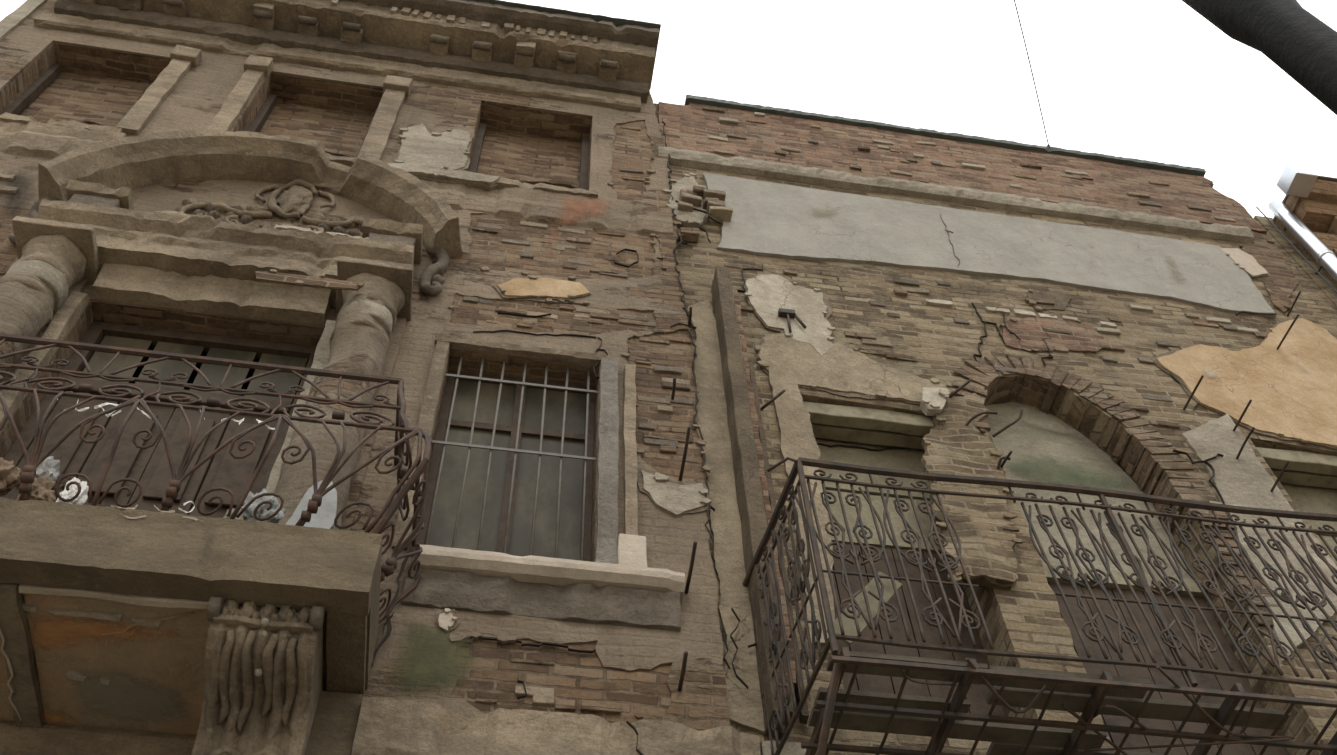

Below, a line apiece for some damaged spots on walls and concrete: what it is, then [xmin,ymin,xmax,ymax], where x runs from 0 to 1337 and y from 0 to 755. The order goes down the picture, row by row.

flaking render [387,123,501,191]
flaking render [468,173,708,301]
crack [940,214,960,265]
flaking render [1220,248,1269,279]
crack [972,302,1053,366]
flaking render [621,330,712,517]
spalling [741,274,1023,590]
flaking render [1151,318,1337,450]
flaking render [436,608,672,721]
crack [722,608,756,689]
crack [626,721,644,755]